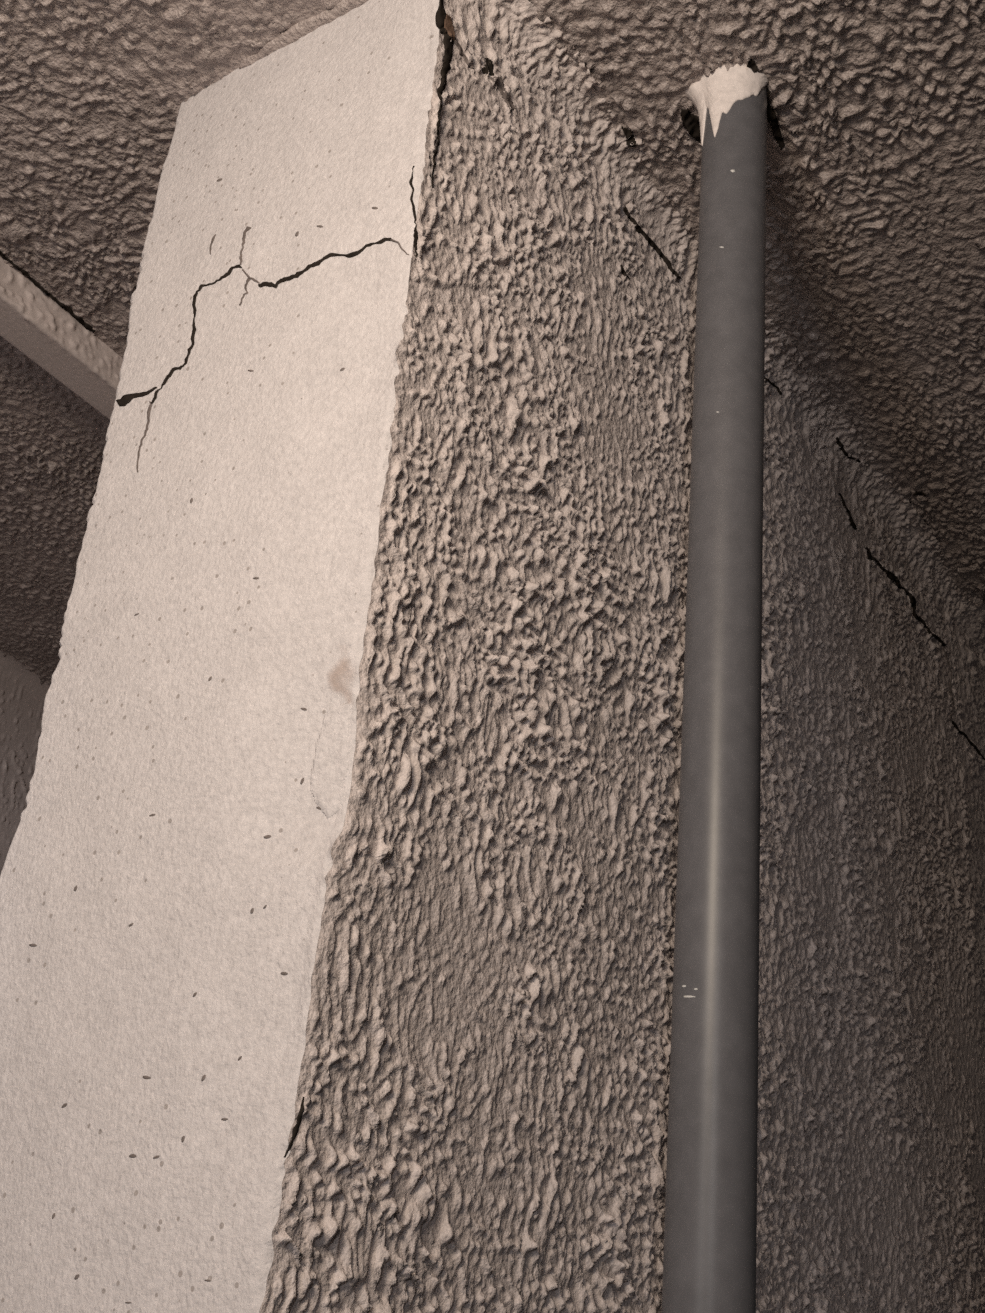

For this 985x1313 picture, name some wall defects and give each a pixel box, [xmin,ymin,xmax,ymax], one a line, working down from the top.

crack [116,0,474,472]
crack [623,206,681,279]
crack [764,376,782,395]
crack [836,437,860,462]
crack [838,493,985,760]